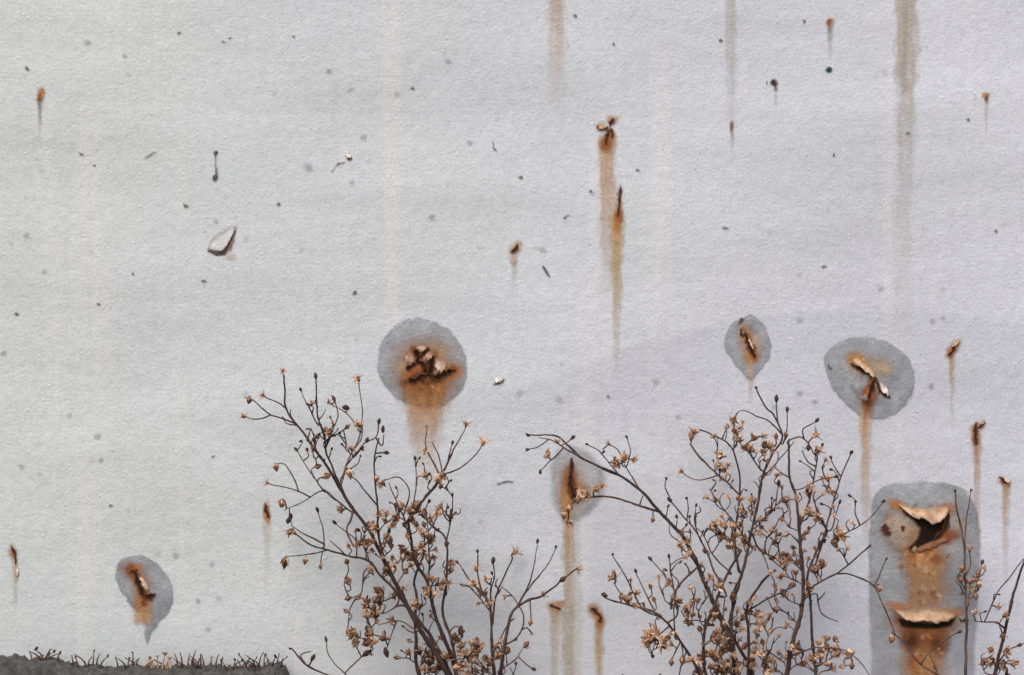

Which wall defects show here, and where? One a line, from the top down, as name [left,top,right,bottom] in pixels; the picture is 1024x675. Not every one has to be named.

peeling [207,225,237,256]
corrosion [597,116,623,303]
corrosion [378,318,466,443]
corrosion [725,315,771,380]
corrosion [824,338,914,481]
corrosion [947,340,961,380]
corrosion [971,420,985,467]
corrosion [999,477,1010,520]
corrosion [116,556,173,642]
corrosion [550,448,604,675]
corrosion [869,482,980,675]